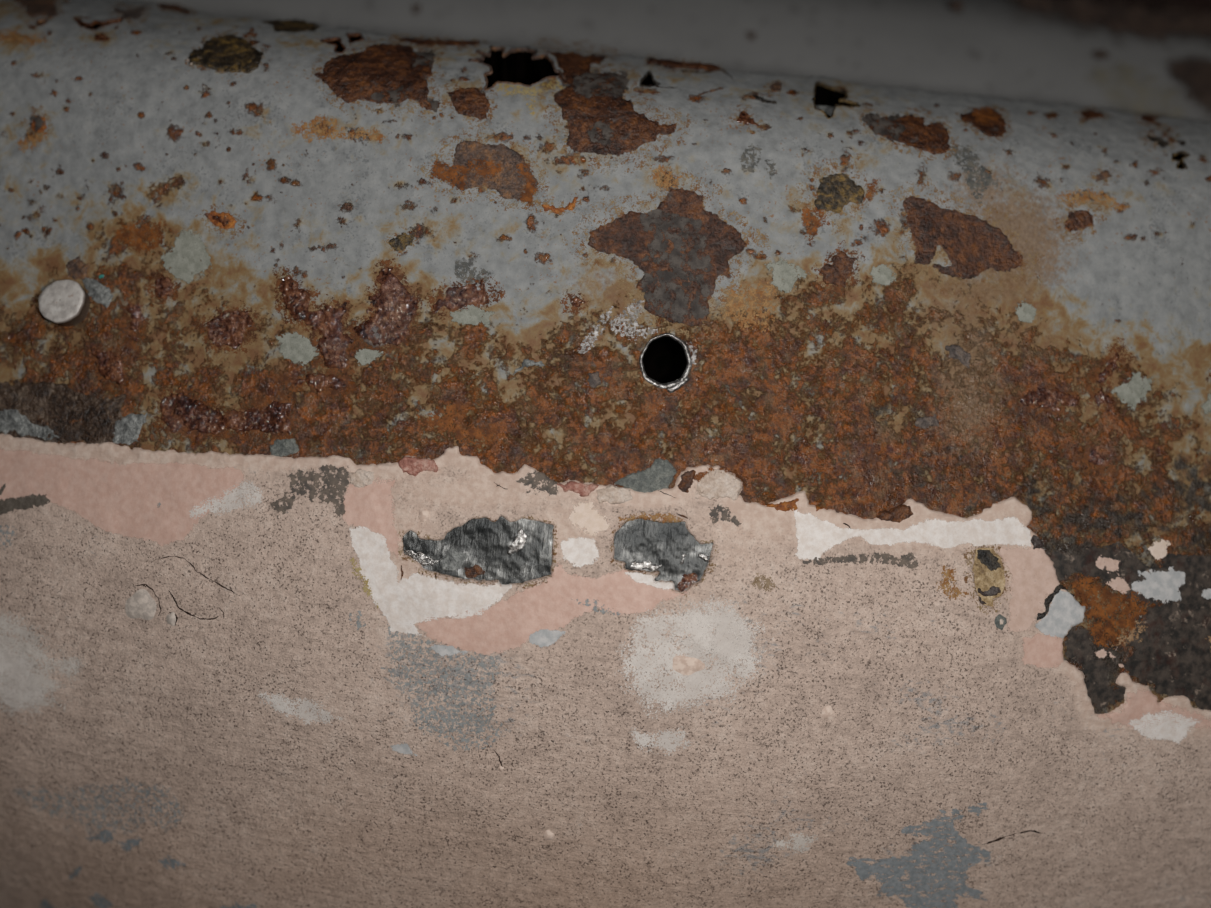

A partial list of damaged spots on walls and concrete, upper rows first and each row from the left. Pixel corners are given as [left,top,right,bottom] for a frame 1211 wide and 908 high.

rust [291,33,779,352]
rust [794,103,1045,300]
rust [0,266,181,444]
rust [151,228,506,445]
peeling [0,409,59,441]
peeling [112,413,148,445]
peeling [270,438,299,457]
peeling [615,458,677,493]
rust [678,464,745,493]
rust [876,504,913,523]
spalling [398,514,559,589]
spalling [610,513,719,598]